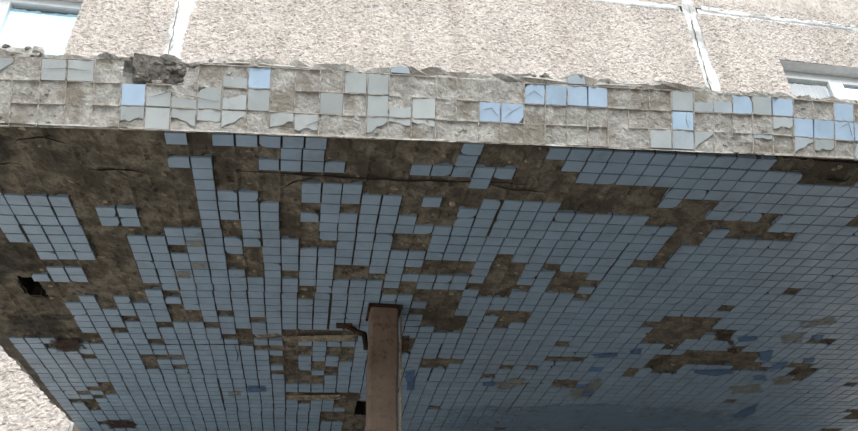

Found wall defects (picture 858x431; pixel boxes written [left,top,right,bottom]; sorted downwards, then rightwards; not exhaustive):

spalling [693,92,858,186]
spalling [0,44,797,383]
spalling [70,381,117,410]
spalling [551,379,580,388]
spalling [785,362,819,380]
spalling [285,391,366,431]
spalling [821,409,858,431]